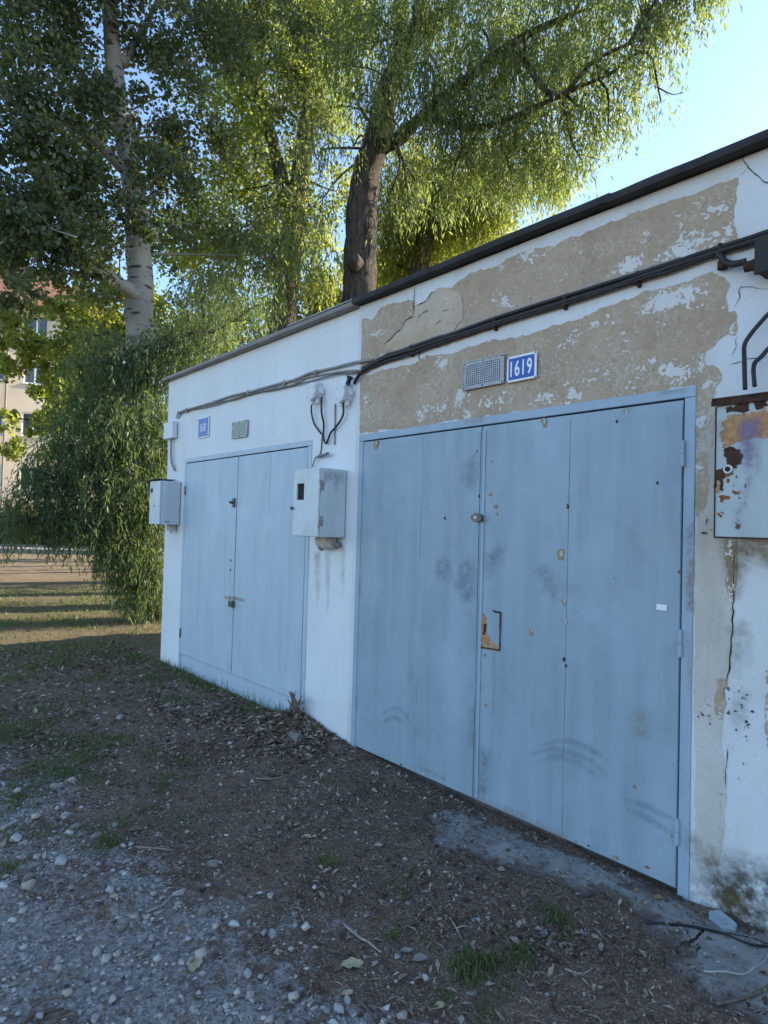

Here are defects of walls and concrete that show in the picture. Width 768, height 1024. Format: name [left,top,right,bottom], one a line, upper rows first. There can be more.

crack [385,291,449,343]
peeling [359,178,739,868]
rust [480,610,501,651]
crack [723,556,735,693]
mould [709,867,768,933]